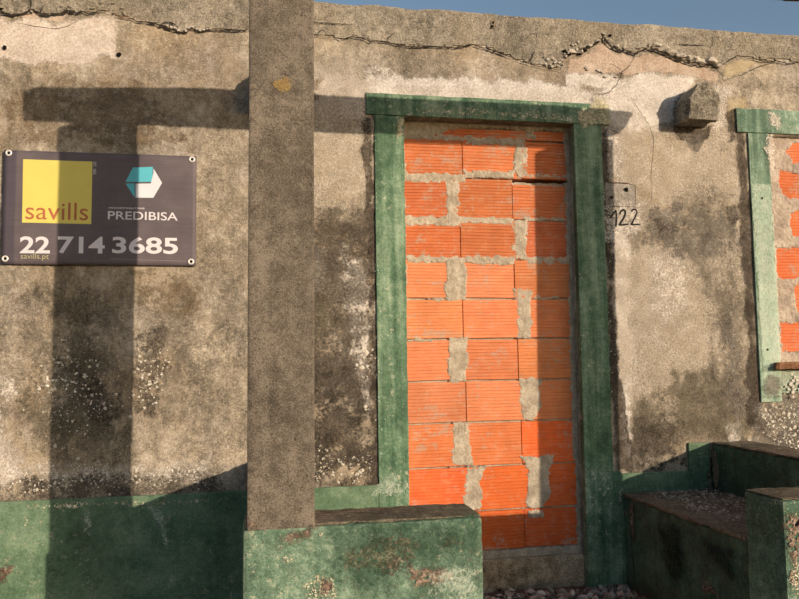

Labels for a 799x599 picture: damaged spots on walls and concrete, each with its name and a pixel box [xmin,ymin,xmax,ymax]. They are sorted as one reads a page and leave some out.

crack [0,0,248,34]
water stain [3,77,195,154]
crack [314,22,799,100]
spalling [418,44,718,129]
water stain [35,283,101,326]
water stain [132,269,202,314]
water stain [314,53,799,485]
water stain [0,326,223,544]
peeling [346,537,453,587]
peeling [784,514,799,595]